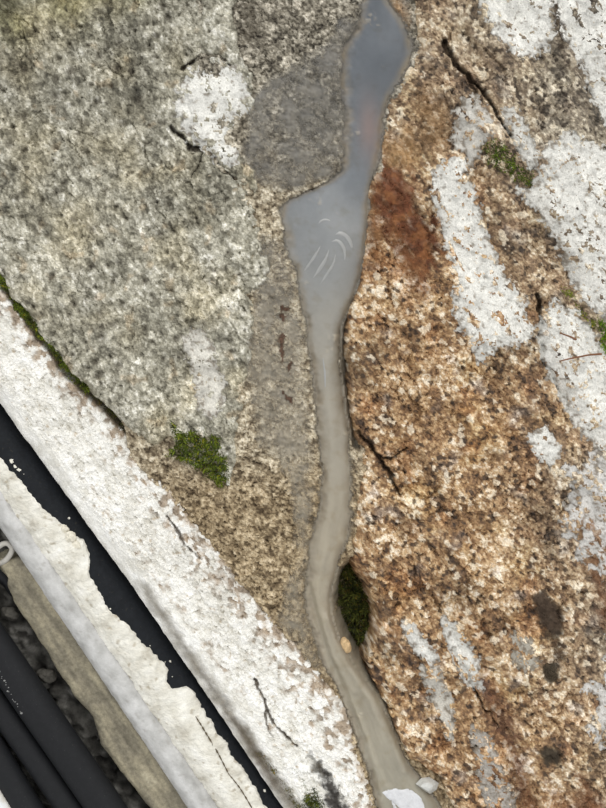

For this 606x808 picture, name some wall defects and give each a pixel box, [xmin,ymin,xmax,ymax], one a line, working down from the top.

crack [253,678,298,746]